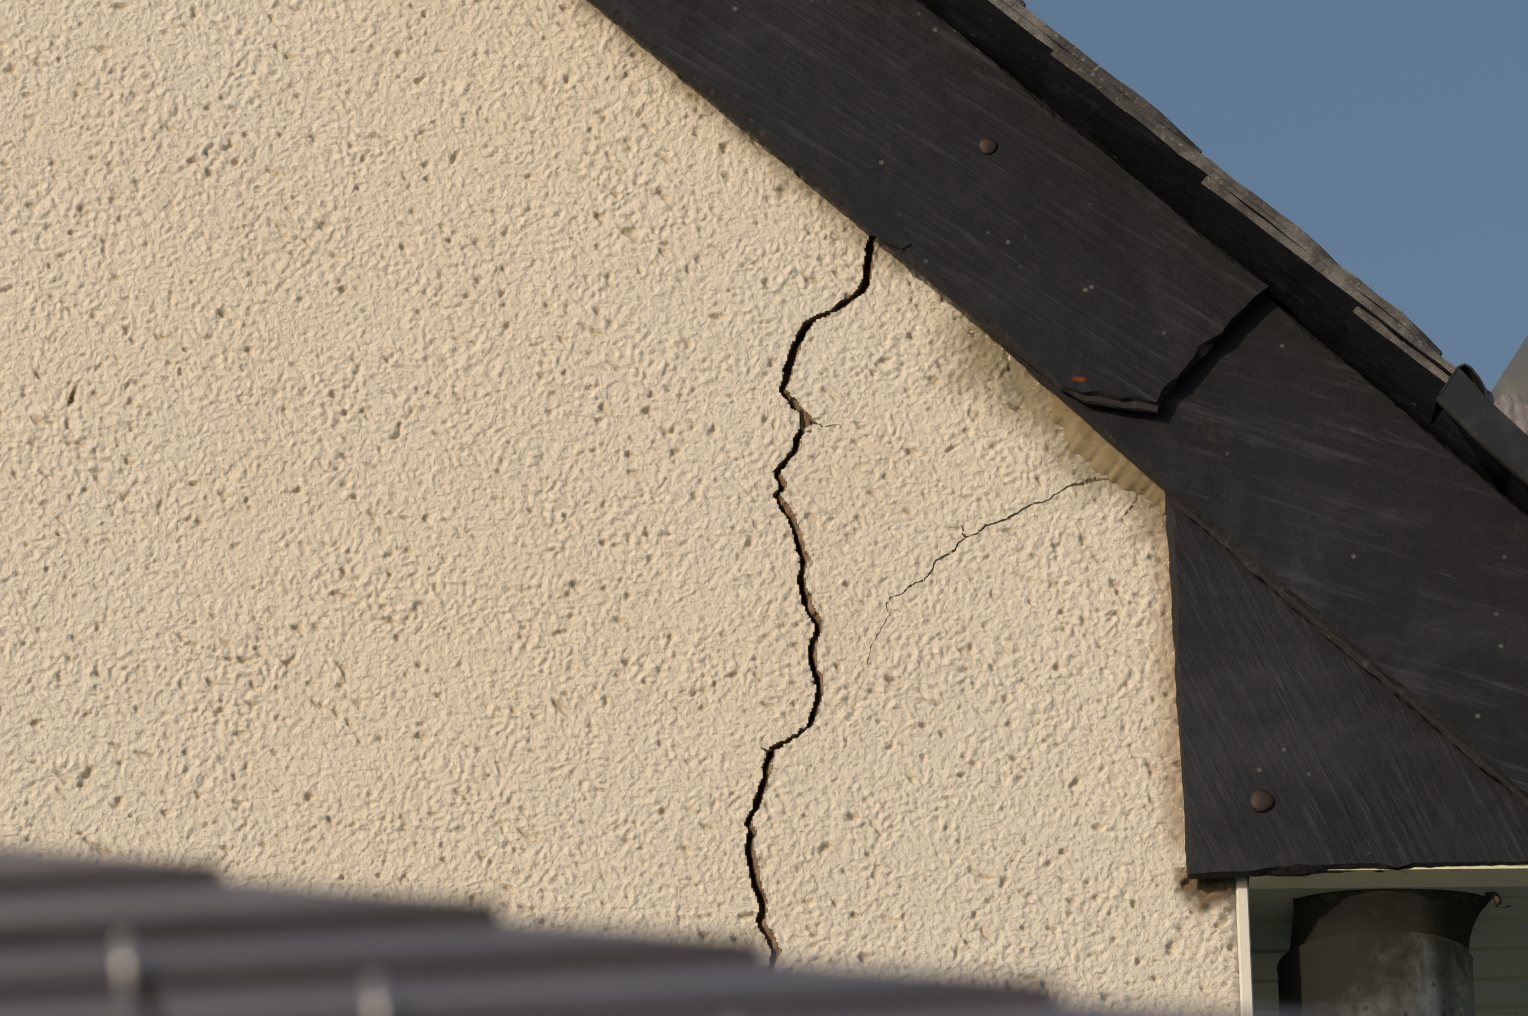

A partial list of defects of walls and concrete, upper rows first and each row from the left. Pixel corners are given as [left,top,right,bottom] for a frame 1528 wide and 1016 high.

crack [744,235,876,958]
crack [867,477,1139,665]